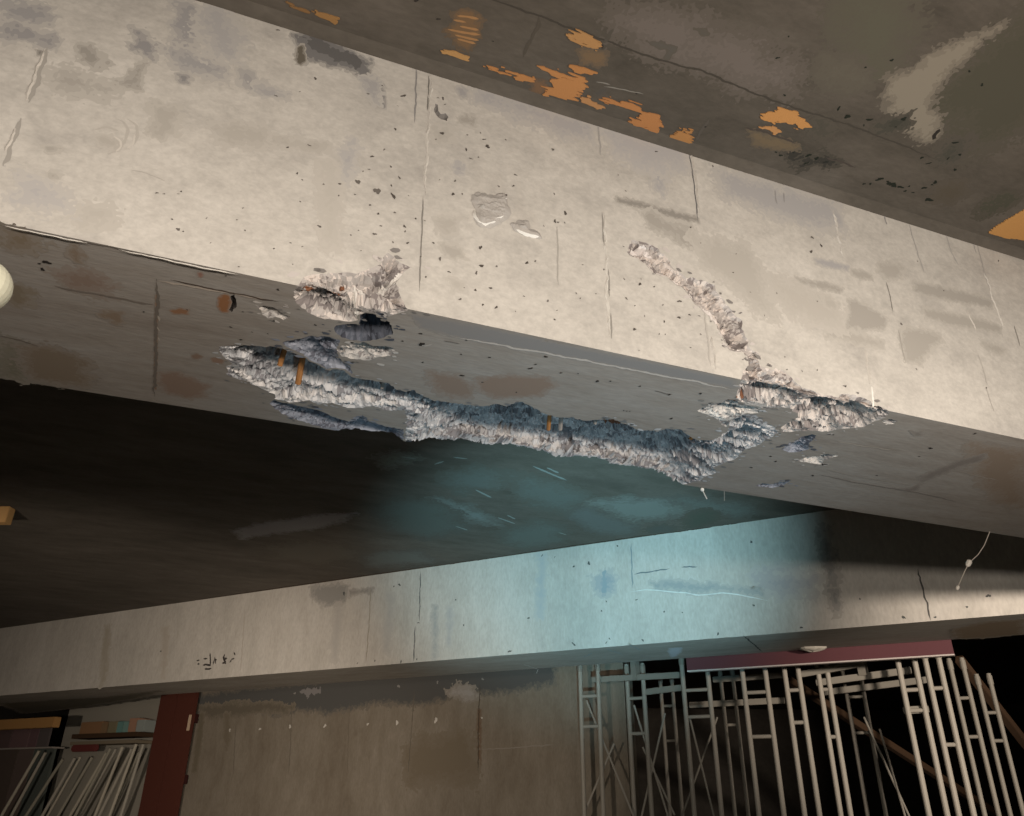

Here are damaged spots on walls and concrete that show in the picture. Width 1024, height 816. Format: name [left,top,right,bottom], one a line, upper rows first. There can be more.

peeling [440,49,470,61]
peeling [566,28,602,51]
peeling [483,64,695,144]
leakage [924,1,1024,170]
leakage [426,0,1008,369]
spalling [212,245,897,485]
crack [918,571,931,620]